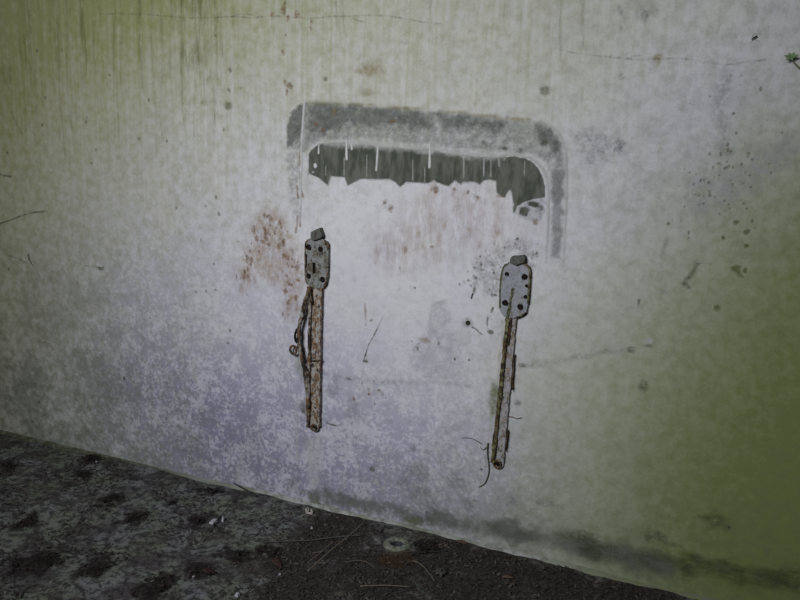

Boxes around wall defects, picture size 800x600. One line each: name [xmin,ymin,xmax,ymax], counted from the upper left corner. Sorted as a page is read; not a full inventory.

peeling [288,103,563,255]
rust [243,214,309,305]
rust [507,263,532,345]
damp [396,508,706,574]